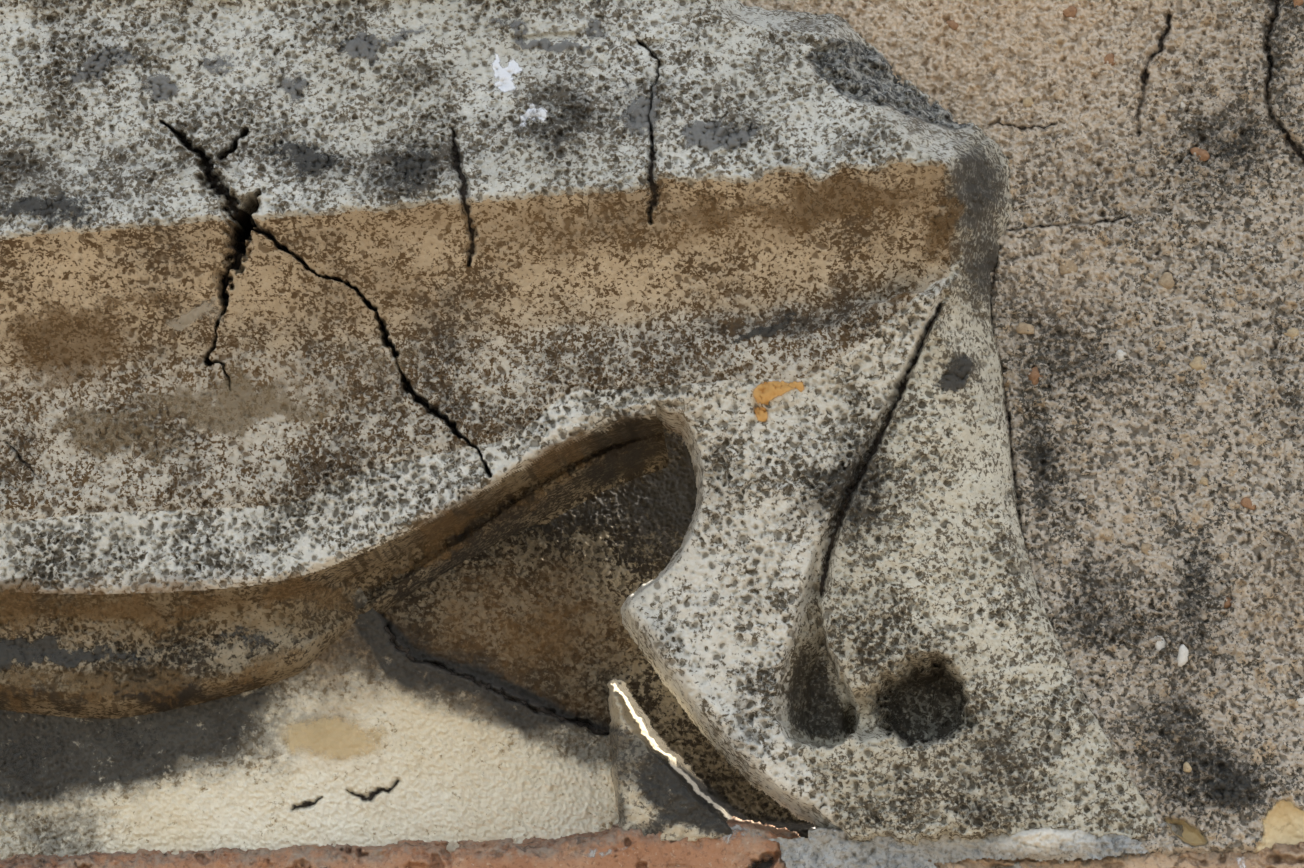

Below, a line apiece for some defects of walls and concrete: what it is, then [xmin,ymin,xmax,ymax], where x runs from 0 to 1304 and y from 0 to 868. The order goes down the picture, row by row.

crack [1138,16,1171,134]
crack [1266,0,1304,161]
crack [648,130,658,223]
crack [164,124,492,477]
crack [819,304,941,596]
flaking render [1254,800,1304,854]